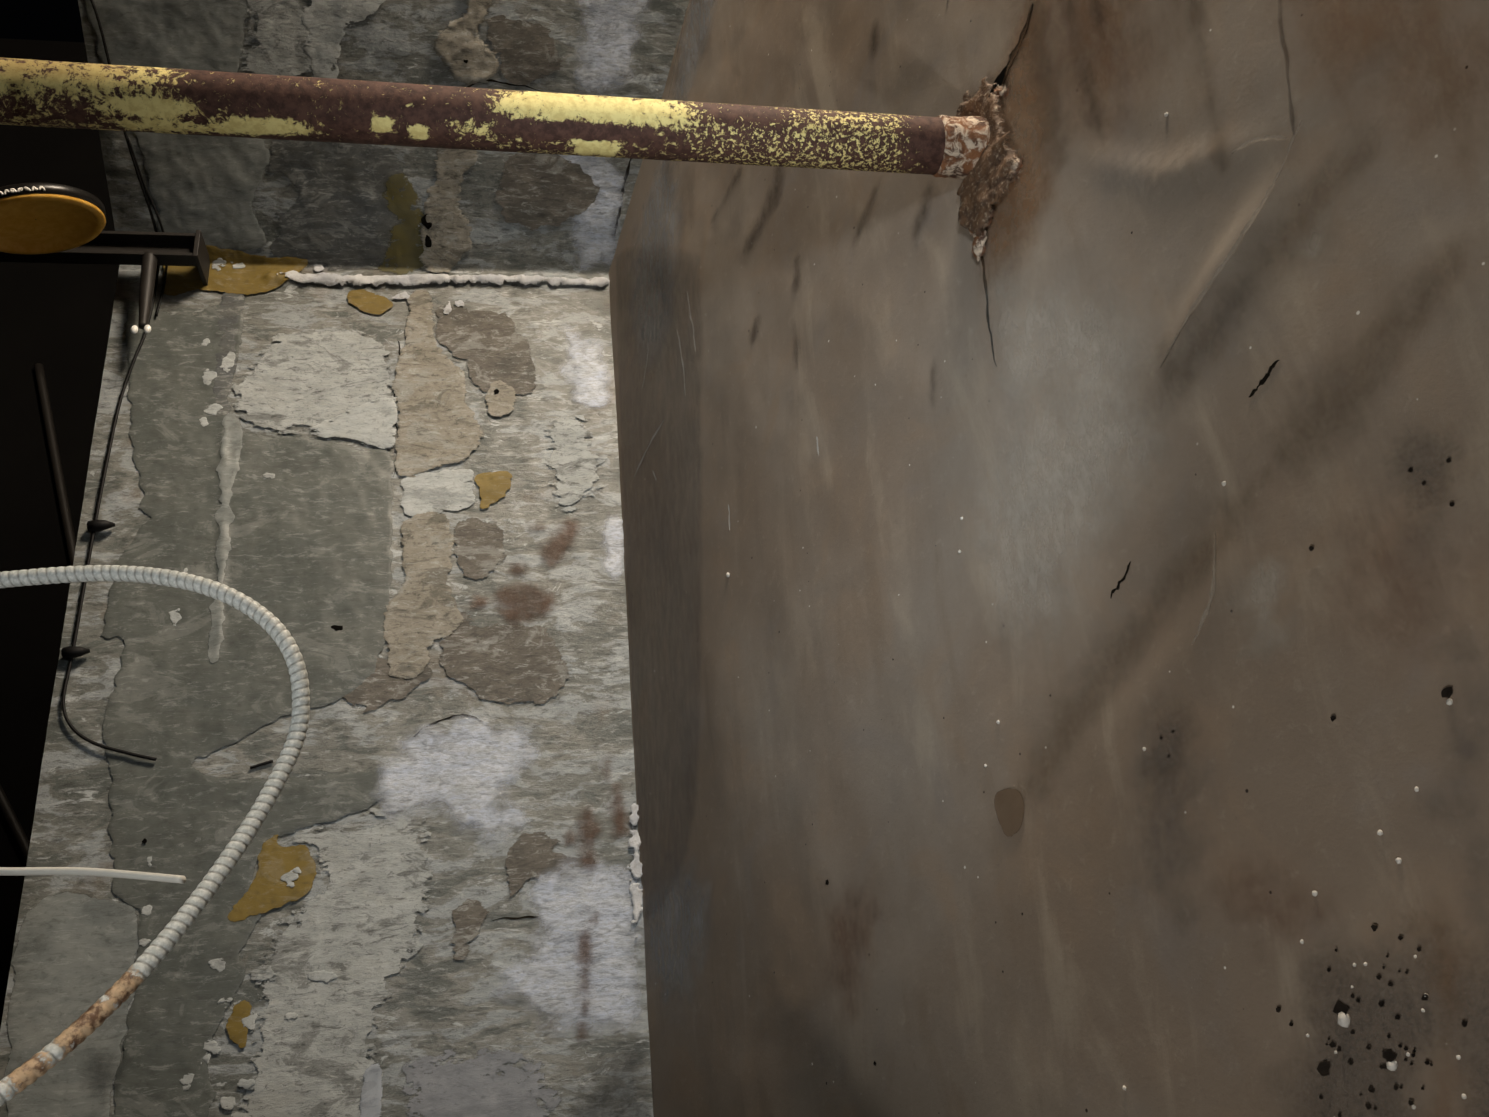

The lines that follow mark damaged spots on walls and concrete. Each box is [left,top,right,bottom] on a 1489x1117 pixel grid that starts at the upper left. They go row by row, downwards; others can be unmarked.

efflorescence [575,0,646,88]
crack [988,4,1033,98]
damp [560,155,623,267]
spalling [956,77,1023,261]
crack [980,256,997,366]
efflorescence [563,333,608,407]
efflorescence [604,518,624,576]
efflorescence [380,719,536,829]
damp [505,865,641,1023]